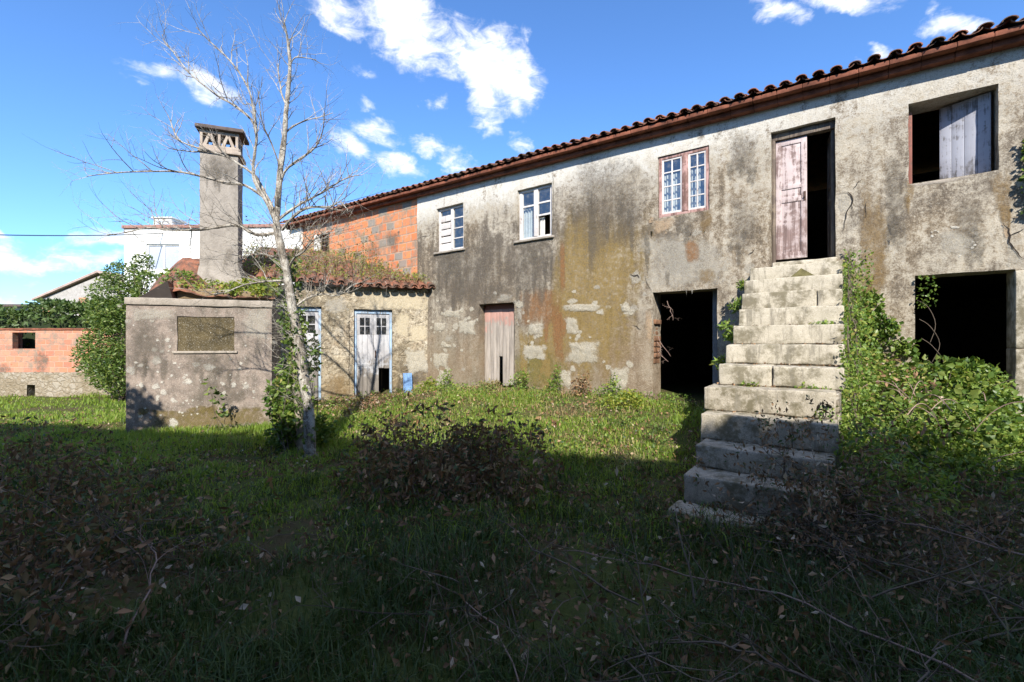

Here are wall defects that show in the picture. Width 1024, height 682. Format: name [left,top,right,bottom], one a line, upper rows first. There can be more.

crack [839,180,866,230]
spalling [560,286,637,395]